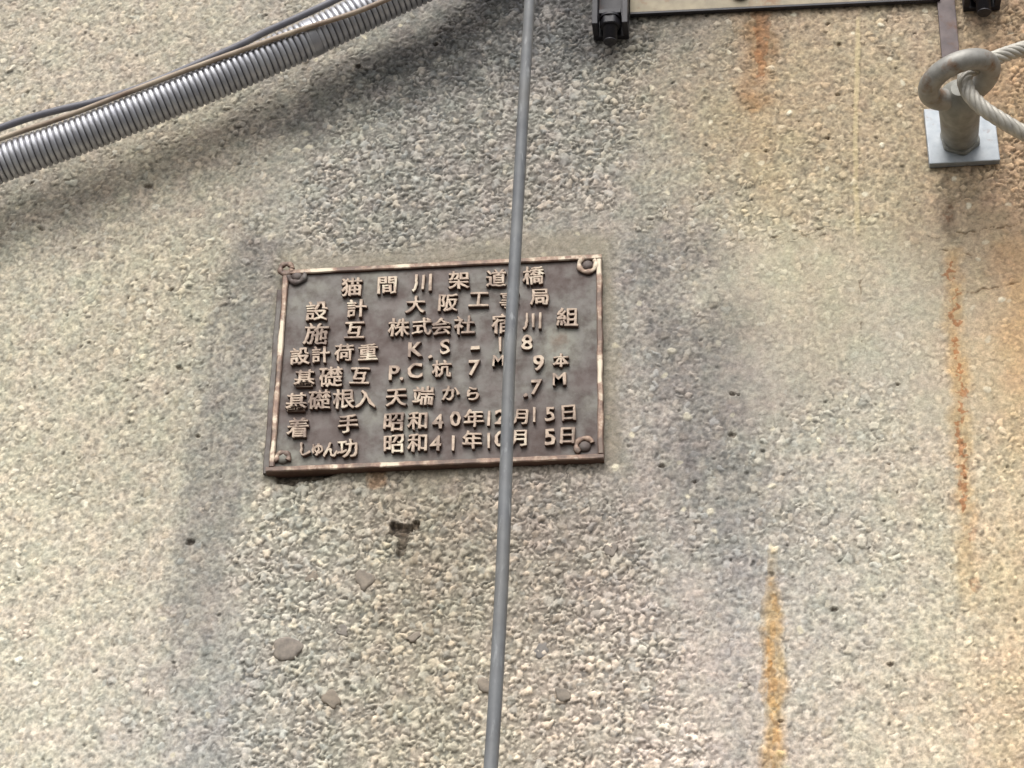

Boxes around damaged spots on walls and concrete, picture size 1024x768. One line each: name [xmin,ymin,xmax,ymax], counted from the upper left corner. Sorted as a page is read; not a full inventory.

rust [630,0,940,225]
rust [937,228,1024,617]
rust [756,545,792,768]